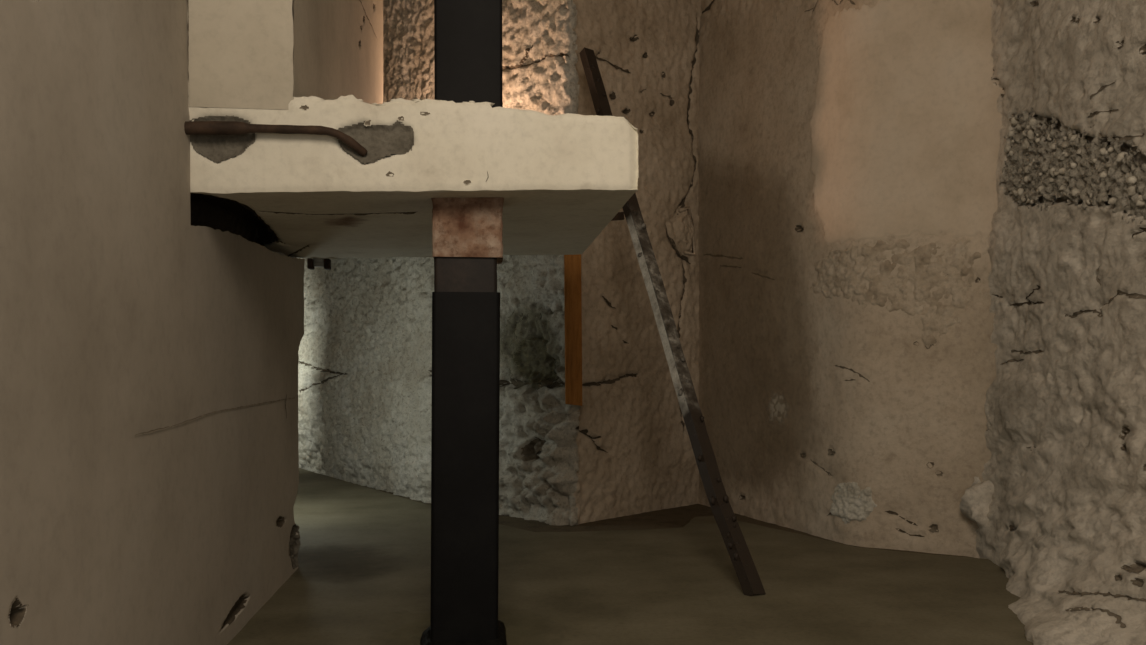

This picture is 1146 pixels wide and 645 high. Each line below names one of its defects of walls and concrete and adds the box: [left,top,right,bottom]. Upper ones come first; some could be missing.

crack [502,0,714,215]
spalling [190,115,255,164]
spalling [338,116,414,165]
spalling [999,82,1146,224]
crack [602,296,627,343]
crack [500,373,637,390]
spalling [221,594,249,629]